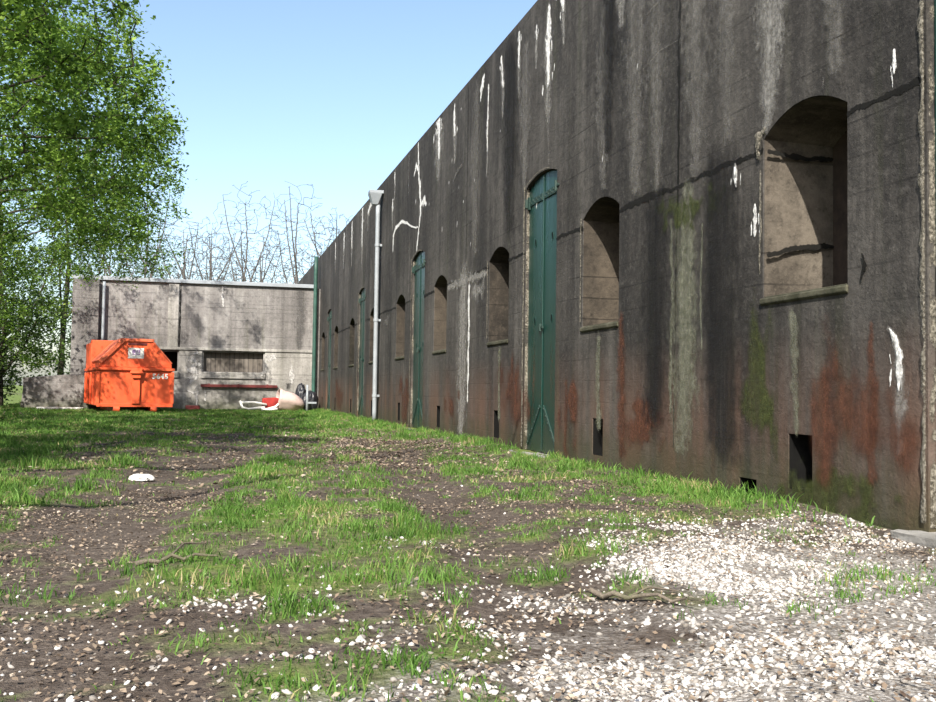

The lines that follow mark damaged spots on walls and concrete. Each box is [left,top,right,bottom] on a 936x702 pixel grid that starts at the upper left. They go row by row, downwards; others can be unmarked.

water stain [433,105,458,178]
water stain [475,74,489,181]
water stain [501,0,565,227]
water stain [601,0,659,171]
water stain [392,143,426,251]
water stain [751,204,760,237]
water stain [642,119,741,455]
water stain [889,328,905,431]